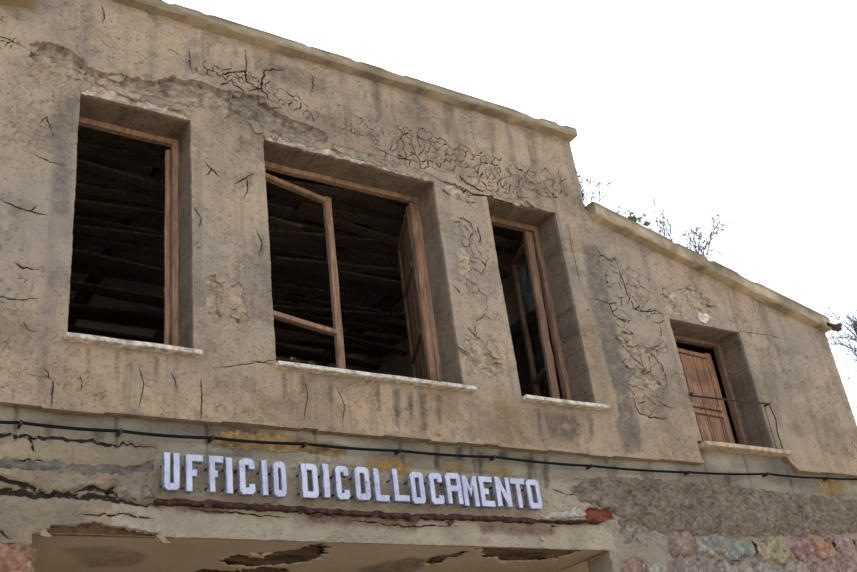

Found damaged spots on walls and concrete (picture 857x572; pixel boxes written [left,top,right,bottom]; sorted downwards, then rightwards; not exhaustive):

flaking render [29,43,431,182]
crack [1,199,46,215]
crack [170,49,568,365]
flaking render [205,276,248,324]
crack [568,224,675,420]
flaking render [0,457,156,502]
peeling [39,522,171,545]
peeling [195,543,331,572]
peeling [423,537,581,566]